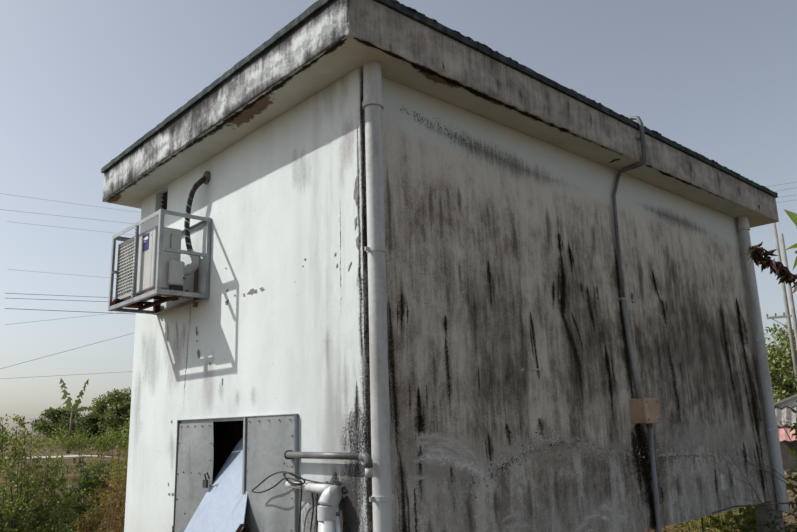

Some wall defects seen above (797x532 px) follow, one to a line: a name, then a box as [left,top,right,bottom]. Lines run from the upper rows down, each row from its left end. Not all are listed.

water stain [106,35,623,203]
water stain [330,73,372,532]
water stain [387,288,616,532]
water stain [546,218,599,405]
water stain [614,251,637,399]
water stain [639,268,668,324]
water stain [626,299,768,532]